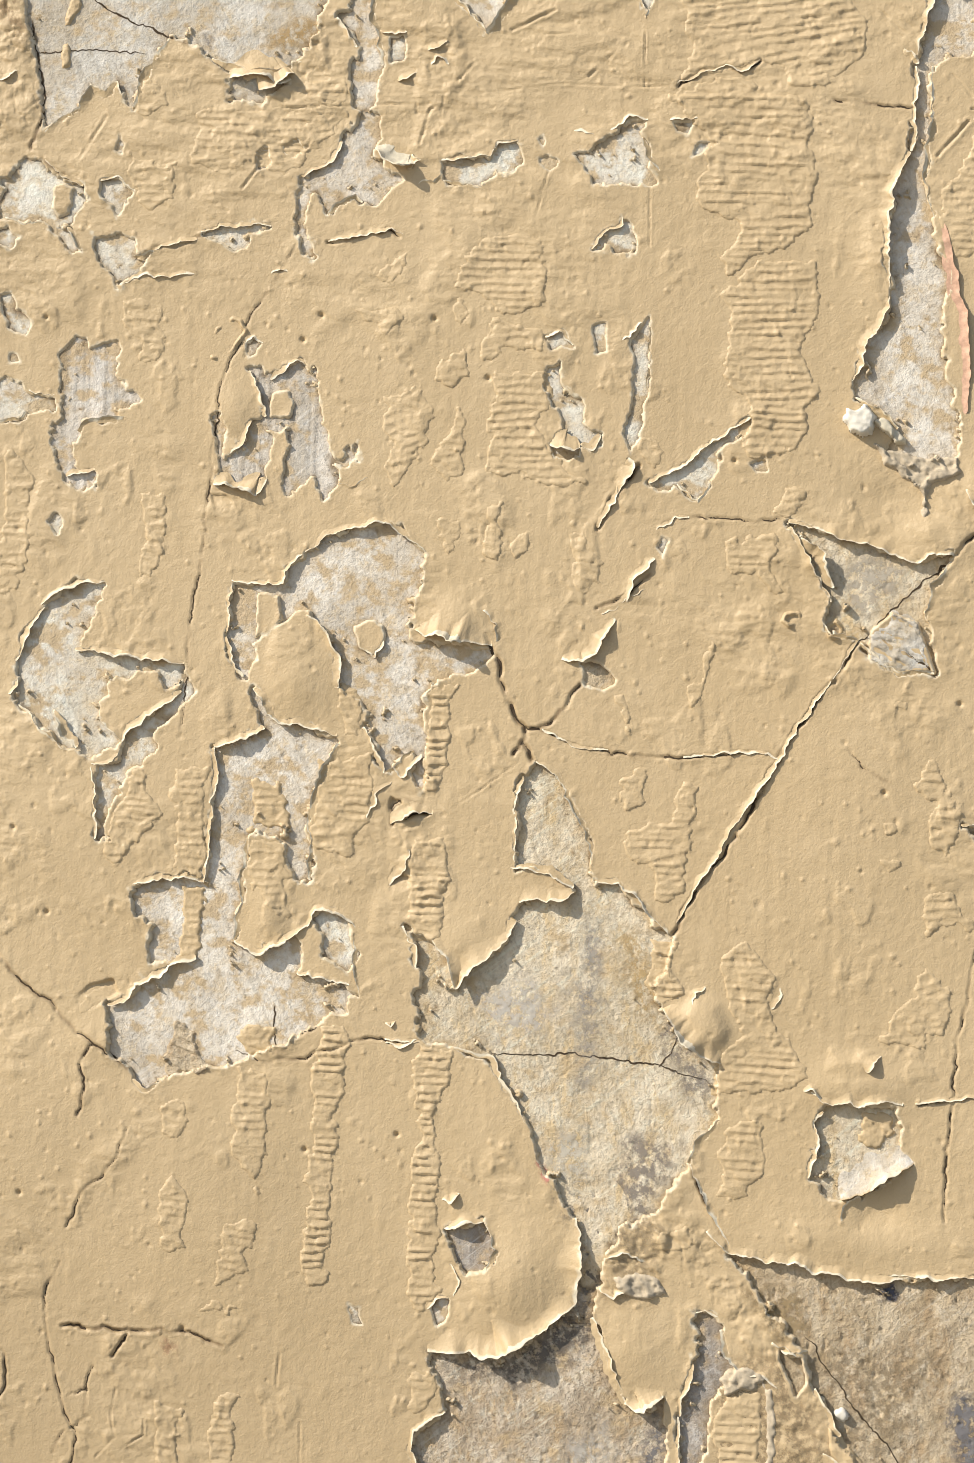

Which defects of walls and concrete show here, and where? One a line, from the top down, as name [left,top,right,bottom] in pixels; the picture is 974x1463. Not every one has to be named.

peeling [27,0,558,259]
peeling [843,0,974,517]
peeling [8,578,195,840]
peeling [106,516,501,1092]
crack [488,645,628,758]
crack [596,457,636,529]
crack [601,515,778,614]
crack [664,489,974,935]
peeling [787,519,954,677]
crack [77,1033,120,1115]
peeling [381,761,974,1463]
crack [43,1282,93,1463]